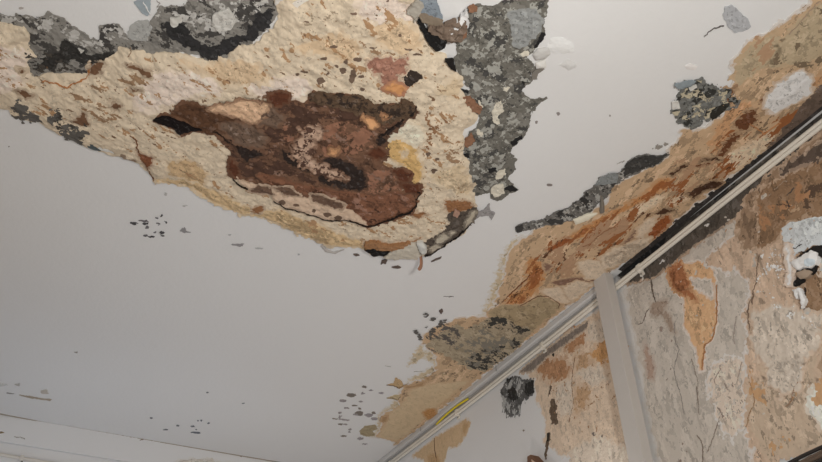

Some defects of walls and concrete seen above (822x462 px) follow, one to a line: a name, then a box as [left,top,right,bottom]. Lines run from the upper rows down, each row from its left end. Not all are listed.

peeling [127,0,160,41]
peeling [723,5,751,33]
spalling [153,57,424,228]
rust [386,139,426,184]
spalling [407,0,551,220]
peeling [130,214,167,238]
peeling [353,240,442,269]
water stain [369,0,822,462]
crack [638,270,656,325]
rust [665,259,720,374]
crack [674,256,759,462]
peeling [781,216,822,309]